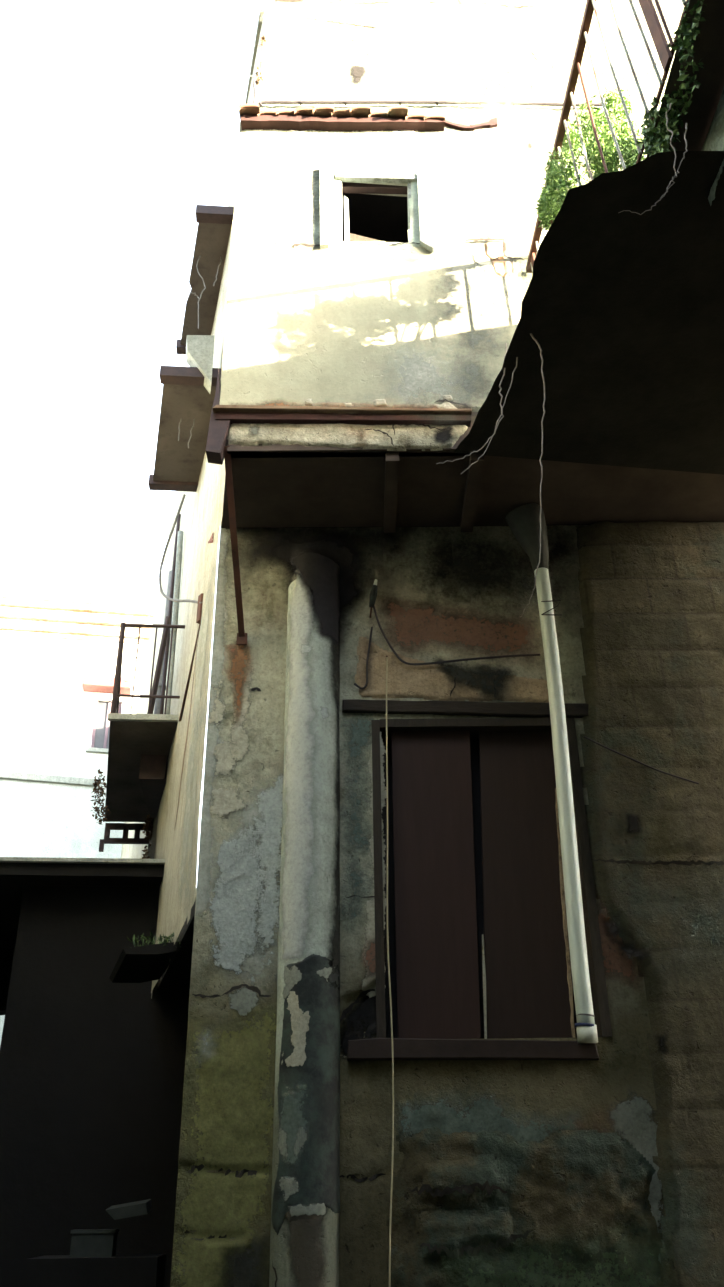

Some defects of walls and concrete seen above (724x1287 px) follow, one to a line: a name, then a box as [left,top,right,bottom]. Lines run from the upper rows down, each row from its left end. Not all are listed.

damp [248,102,557,406]
spalling [469,242,512,292]
corrosion [227,644,250,720]
peeling [208,663,387,1235]
damp [398,1093,599,1143]